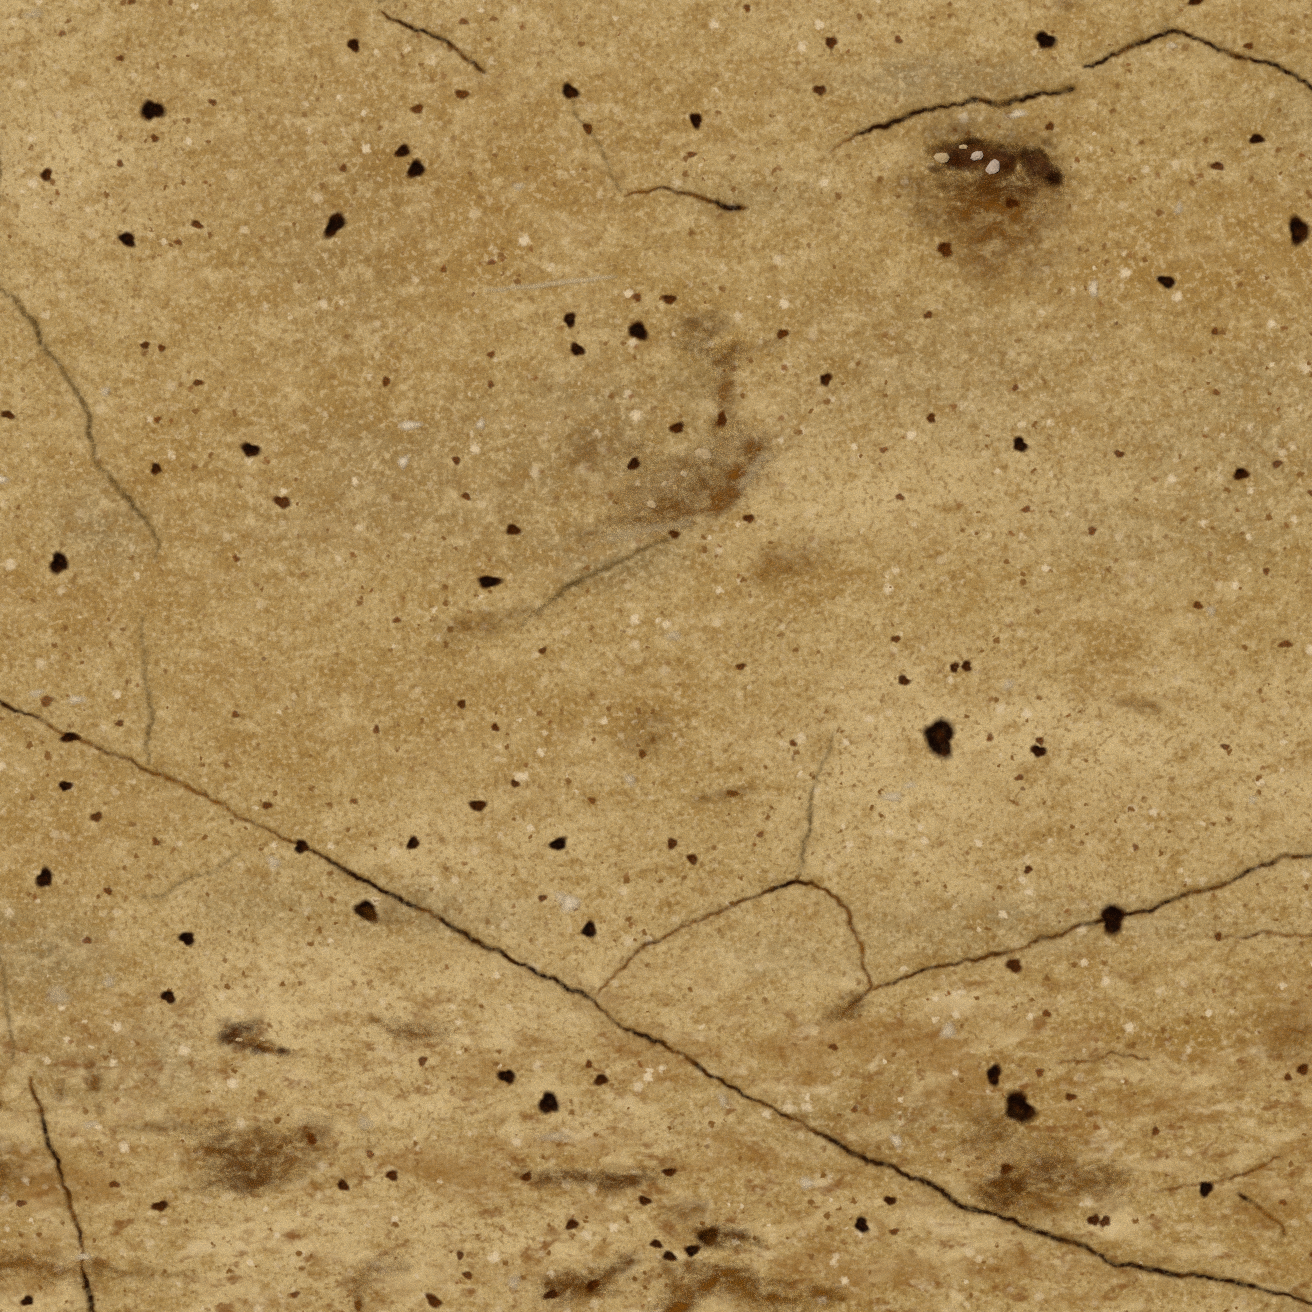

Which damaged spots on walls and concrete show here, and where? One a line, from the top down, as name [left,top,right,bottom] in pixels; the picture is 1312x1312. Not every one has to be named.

crack [381,11,484,73]
crack [839,29,1312,146]
crack [628,186,746,211]
crack [0,289,160,550]
crack [0,689,1312,1312]